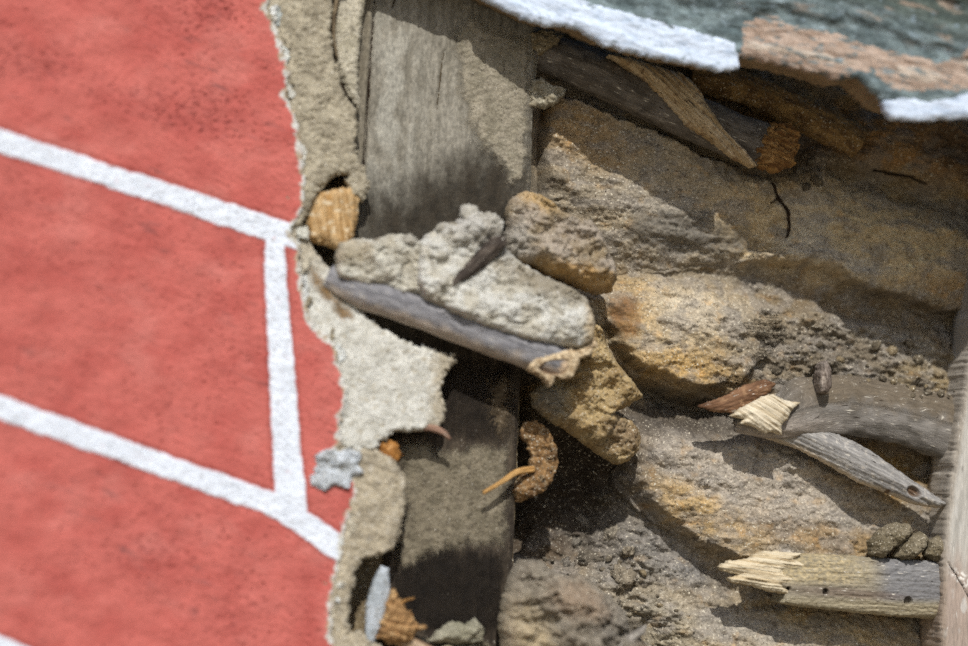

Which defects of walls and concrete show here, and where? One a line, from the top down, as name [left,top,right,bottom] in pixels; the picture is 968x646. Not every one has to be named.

peeling [738,15,968,92]
crack [770,181,791,238]
crack [873,169,927,185]
flaking render [267,0,458,646]